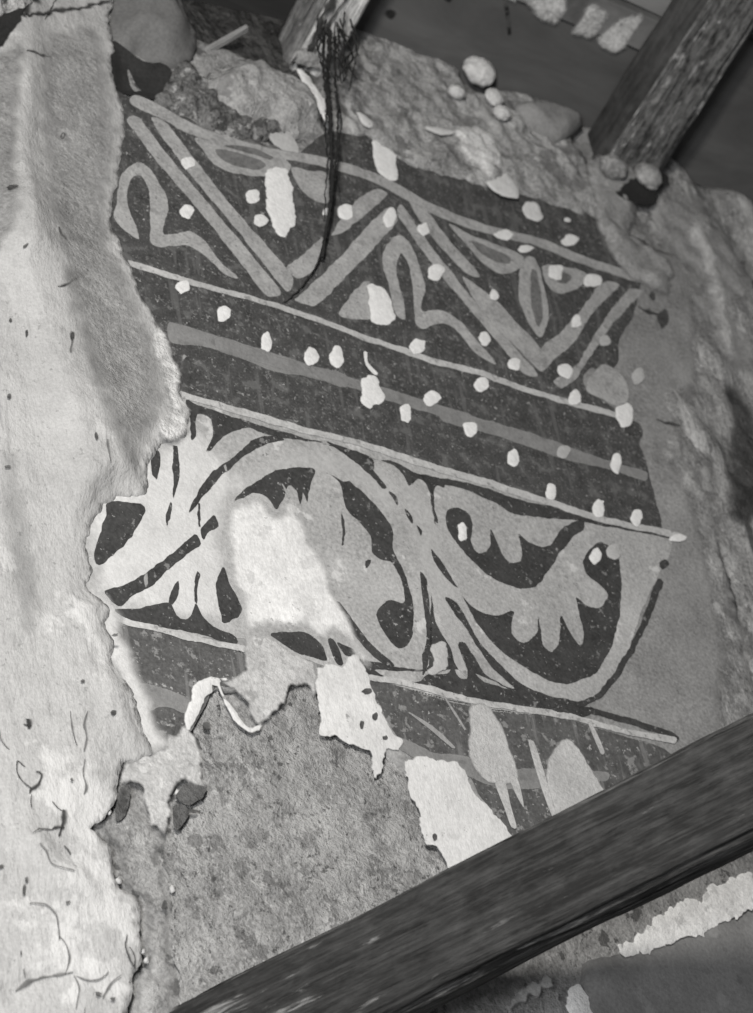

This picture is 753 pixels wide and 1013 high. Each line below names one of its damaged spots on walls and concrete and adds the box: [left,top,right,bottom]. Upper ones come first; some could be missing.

flaking render [103,500,524,1013]
peeling [528,739,604,816]
peeling [588,722,605,755]